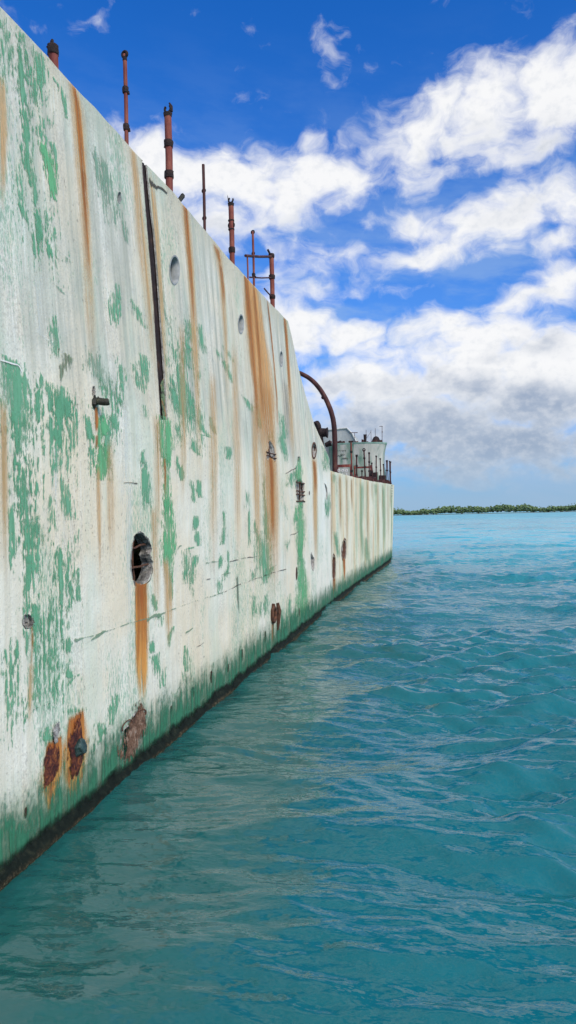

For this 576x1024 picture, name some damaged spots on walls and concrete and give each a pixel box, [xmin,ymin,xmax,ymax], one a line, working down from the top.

peeling [0,16,75,294]
corrosion [70,83,91,277]
peeling [0,315,234,750]
corrosion [135,516,172,693]
corrosion [155,425,166,493]
corrosion [244,275,293,527]
corrosion [41,711,85,809]